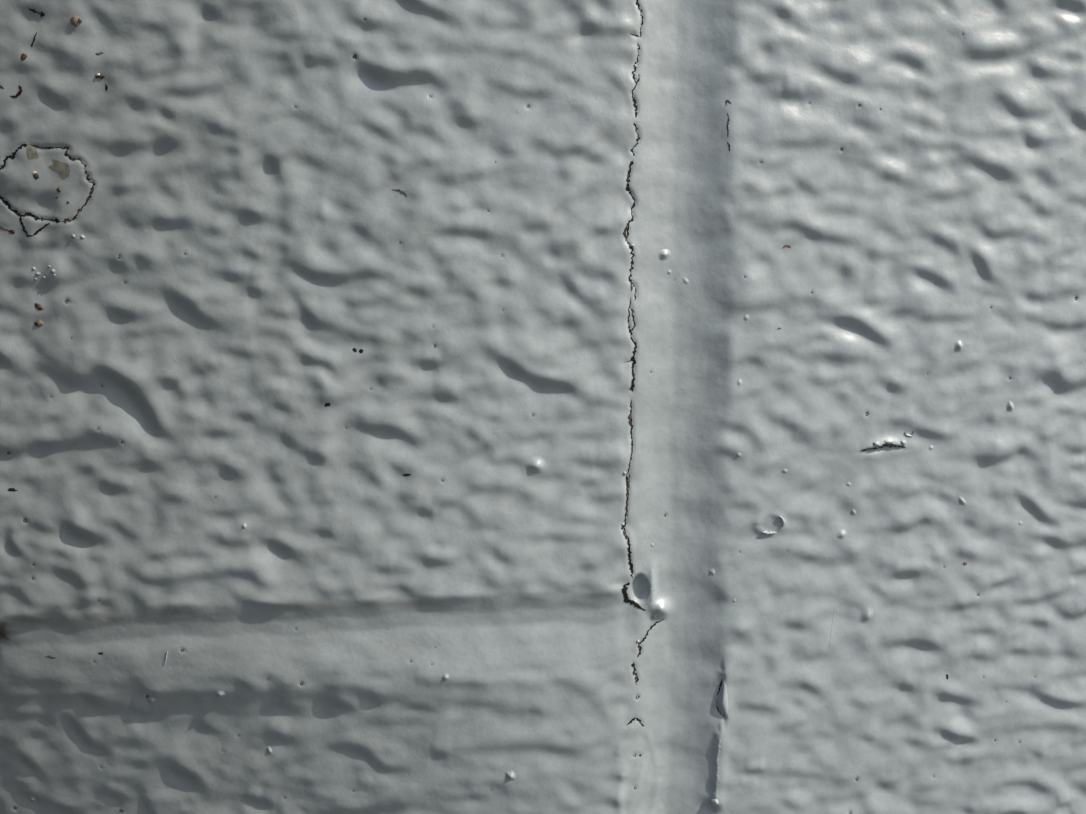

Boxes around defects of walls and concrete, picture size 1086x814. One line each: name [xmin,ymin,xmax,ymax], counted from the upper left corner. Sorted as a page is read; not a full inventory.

crack [0,144,95,237]
crack [621,0,644,578]
crack [631,619,664,683]